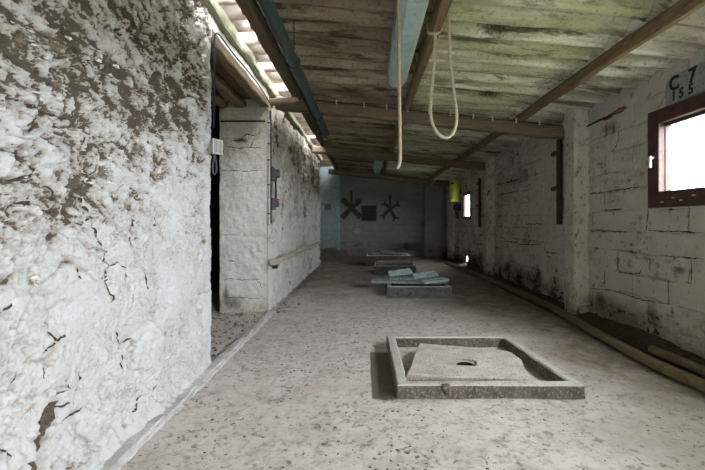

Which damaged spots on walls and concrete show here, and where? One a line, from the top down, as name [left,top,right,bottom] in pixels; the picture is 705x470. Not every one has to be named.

flaking render [11,21,72,62]
flaking render [97,46,120,77]
flaking render [28,86,60,126]
flaking render [81,157,115,184]
flaking render [121,139,151,161]
crack [5,165,127,303]
crack [43,322,66,379]
crack [54,373,82,422]
spalling [28,401,58,470]